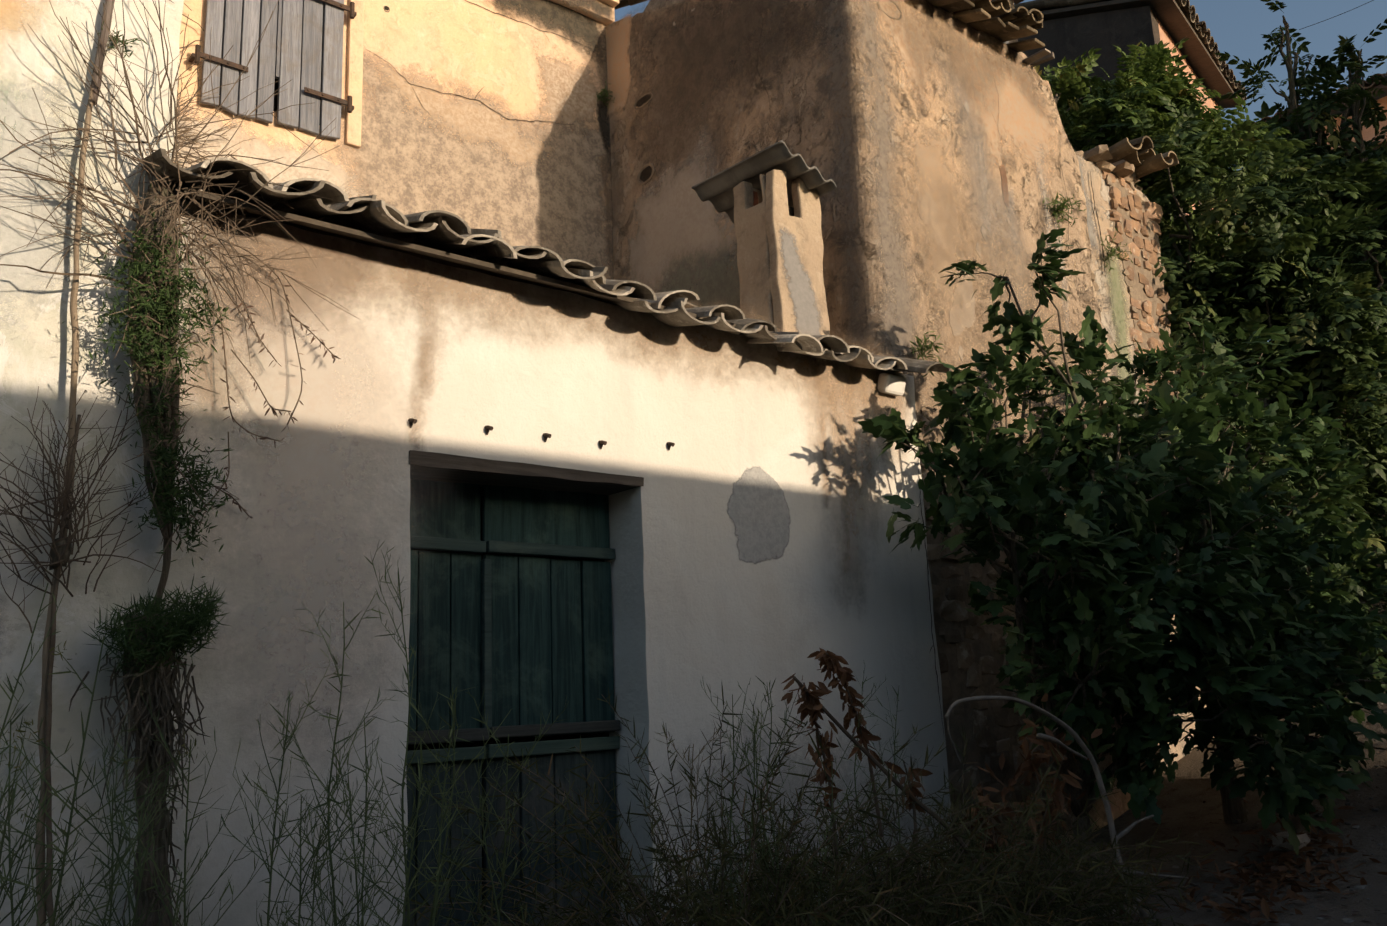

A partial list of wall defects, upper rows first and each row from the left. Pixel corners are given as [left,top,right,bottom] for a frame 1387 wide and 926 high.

peeling [378,63,555,165]
crack [366,49,575,125]
peeling [537,55,601,130]
water stain [179,0,1068,411]